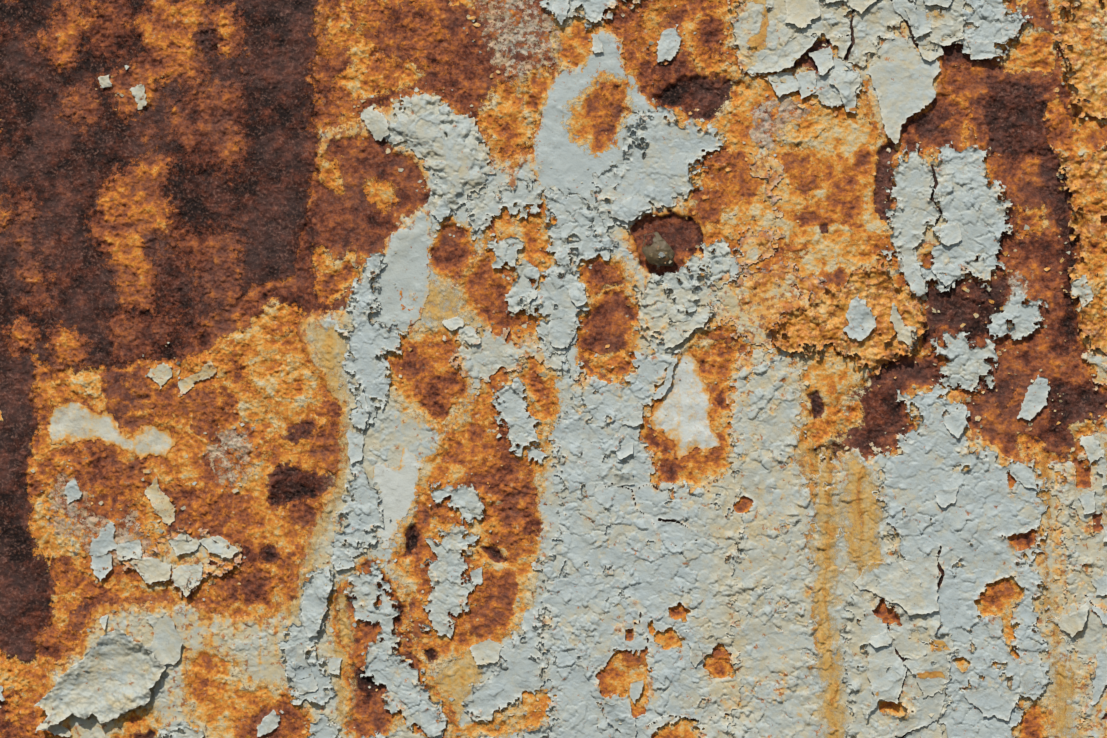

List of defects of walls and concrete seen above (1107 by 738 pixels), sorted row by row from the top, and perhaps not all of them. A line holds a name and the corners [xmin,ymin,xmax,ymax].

corrosion [560,69,639,158]
peeling [46,471,242,598]
peeling [278,210,485,738]
corrosion [325,196,566,738]
corrosion [571,252,642,385]
corrosion [639,319,767,492]
peeling [442,0,1107,738]
corrosion [791,0,1107,738]
peeling [34,615,184,737]
corrosion [179,647,315,738]
corrosion [595,602,691,718]
corrosion [703,643,737,678]